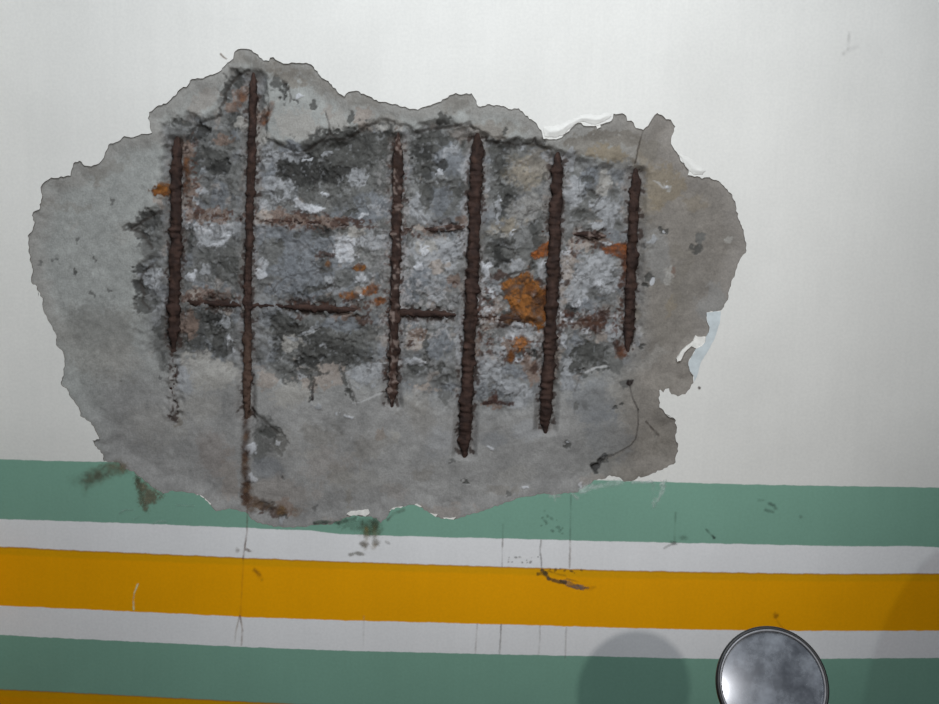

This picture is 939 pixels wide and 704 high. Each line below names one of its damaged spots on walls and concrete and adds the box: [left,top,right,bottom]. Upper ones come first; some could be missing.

rust [151,183,171,196]
rust [531,242,549,259]
rust [603,243,628,279]
rust [339,284,386,305]
spalling [29,49,746,527]
rust [501,272,546,330]
rust [564,311,606,330]
rust [508,337,528,361]
rust [242,411,250,469]
crack [590,423,652,471]